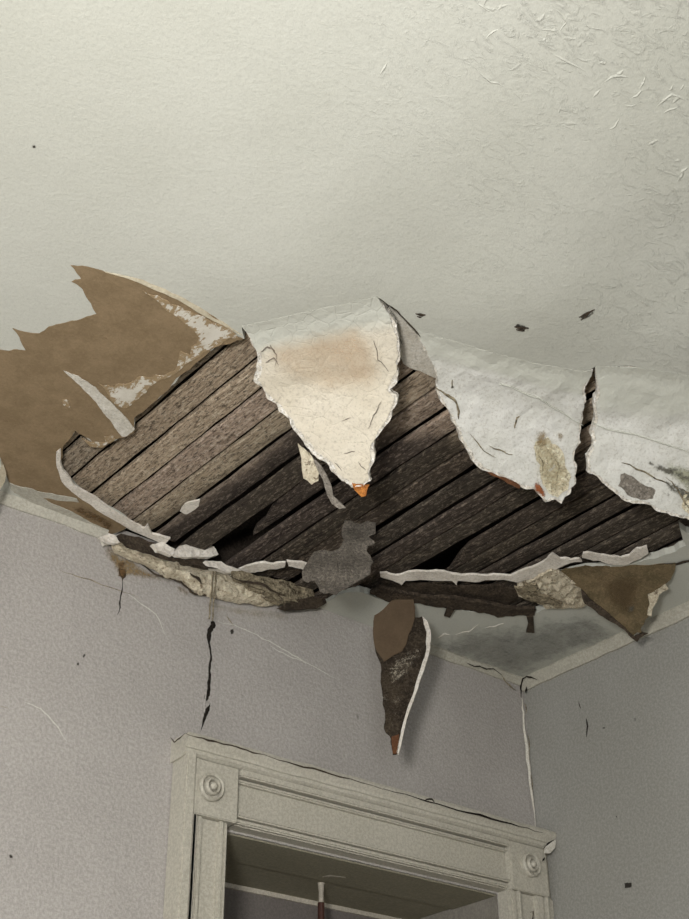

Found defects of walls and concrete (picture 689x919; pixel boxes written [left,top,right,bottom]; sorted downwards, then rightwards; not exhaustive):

spalling [381,299,436,378]
peeling [0,265,315,607]
crack [436,380,513,458]
crack [500,383,689,453]
peeling [618,473,656,500]
crack [621,462,689,508]
spalling [514,568,586,609]
crack [170,571,543,833]